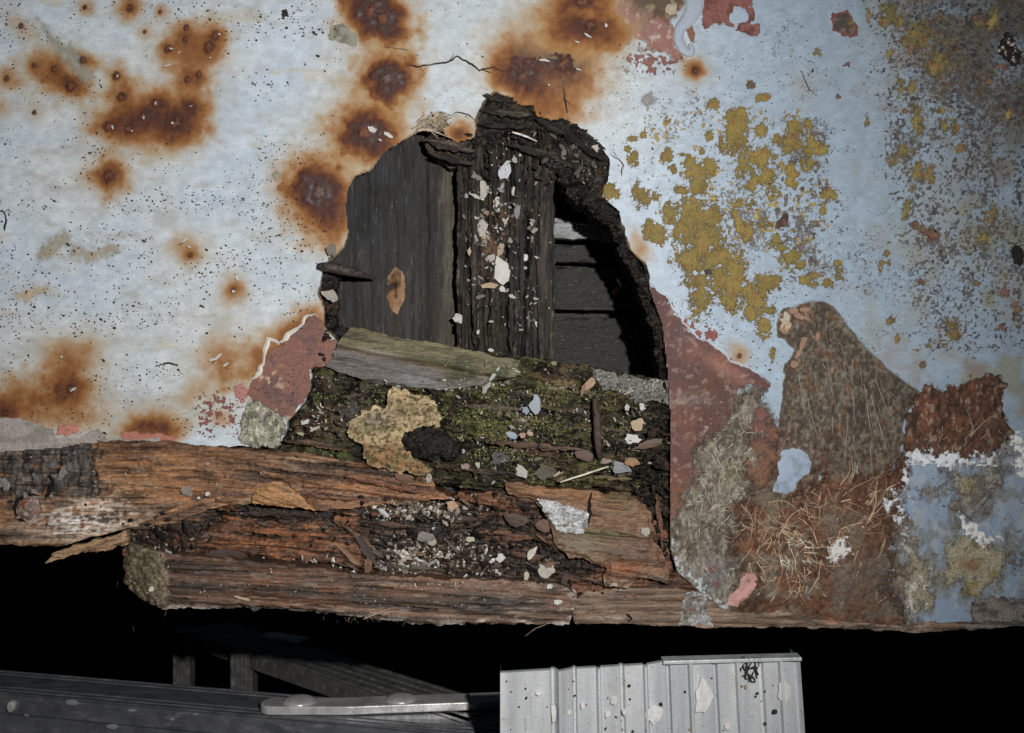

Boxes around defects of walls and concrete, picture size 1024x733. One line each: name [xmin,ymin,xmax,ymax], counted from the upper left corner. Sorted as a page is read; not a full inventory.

spalling [0,2,122,222]
corrosion [0,6,229,201]
corrosion [275,0,427,252]
crack [386,47,505,73]
corrosion [485,0,633,123]
peeling [615,0,760,86]
corrosion [683,59,707,81]
corrosion [0,340,105,429]
peeling [0,115,343,441]
peeling [467,156,528,292]
peeling [482,366,520,394]
peeling [592,36,1024,627]